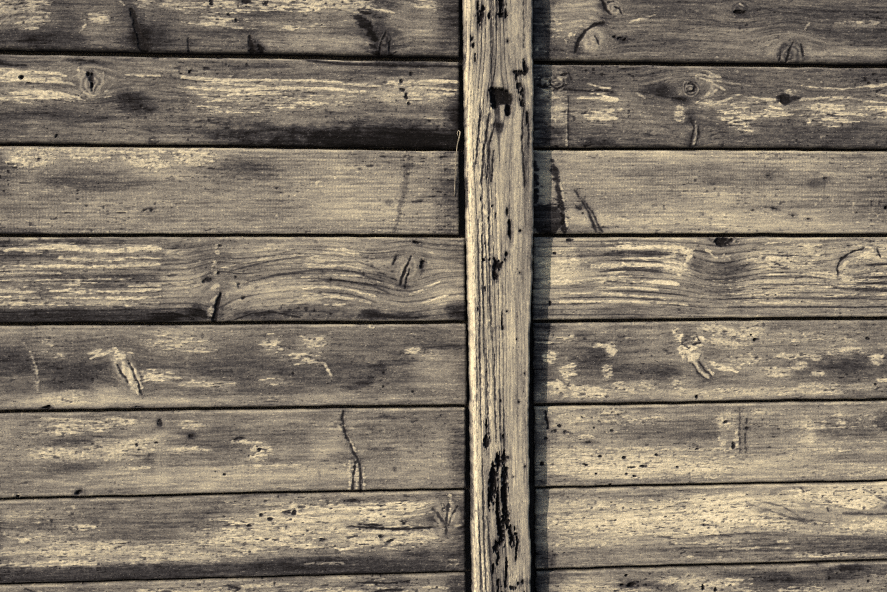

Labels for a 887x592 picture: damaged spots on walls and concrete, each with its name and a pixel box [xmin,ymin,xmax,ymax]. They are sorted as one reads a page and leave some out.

crack [535,0,623,148]
crack [520,107,531,187]
crack [573,189,605,234]
crack [392,254,413,290]
crack [422,0,506,592]
crack [115,359,144,396]
crack [681,335,713,381]
peeling [524,321,887,485]
crack [339,409,364,490]
crack [346,493,454,536]
peeling [537,412,887,560]
crack [355,580,411,592]